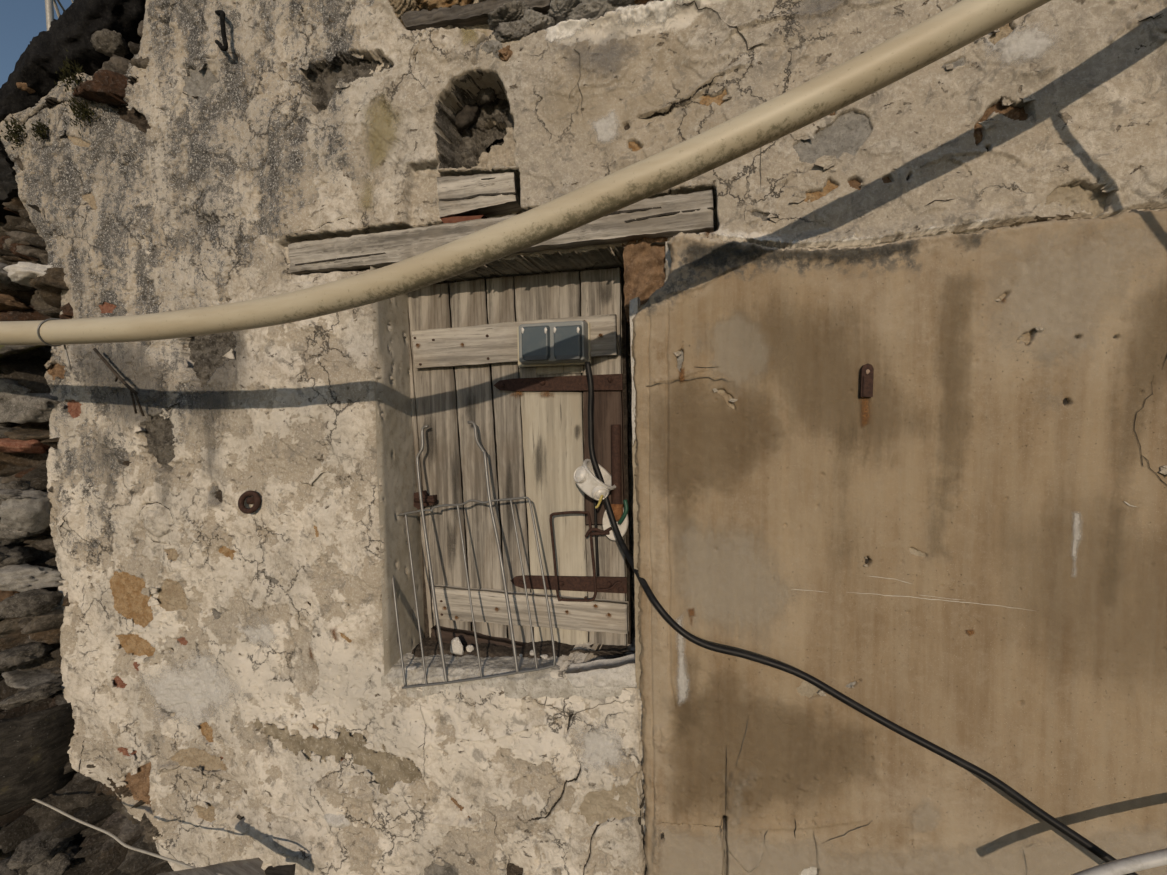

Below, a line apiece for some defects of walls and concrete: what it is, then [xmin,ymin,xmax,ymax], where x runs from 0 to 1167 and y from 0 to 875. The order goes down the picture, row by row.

spalling [388,0,471,26]
spalling [988,23,1013,45]
spalling [435,0,664,169]
spalling [974,94,1035,152]
spalling [789,111,872,203]
spalling [751,210,780,223]
damp [686,219,997,267]
crack [1134,356,1167,485]
damp [1073,513,1081,557]
damp [678,620,688,702]
crack [524,689,626,821]